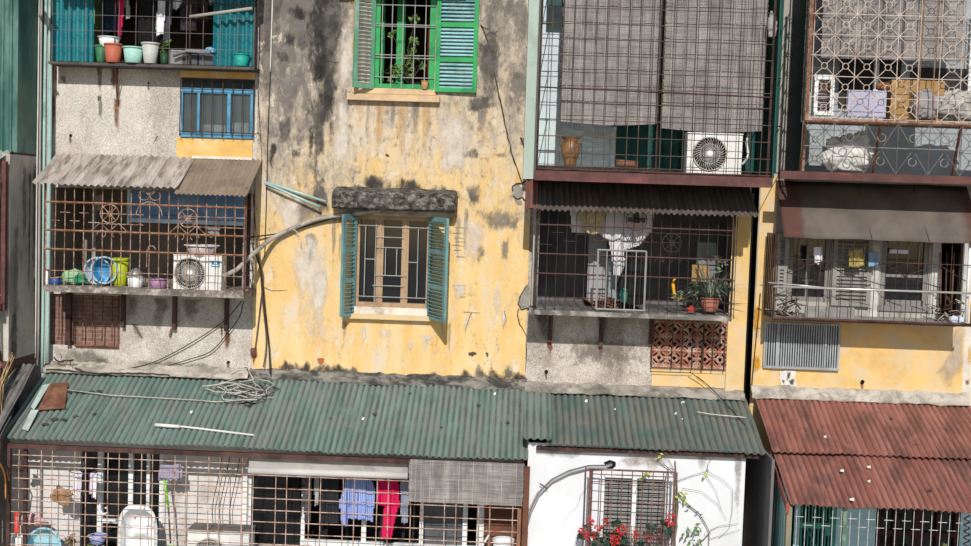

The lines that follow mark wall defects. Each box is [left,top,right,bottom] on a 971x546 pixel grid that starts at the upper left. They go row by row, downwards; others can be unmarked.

damp [263,0,342,222]
damp [352,175,446,190]
peeling [280,198,300,241]
peeling [294,237,327,333]
damp [573,340,631,366]
damp [280,361,357,374]
damp [462,366,527,380]